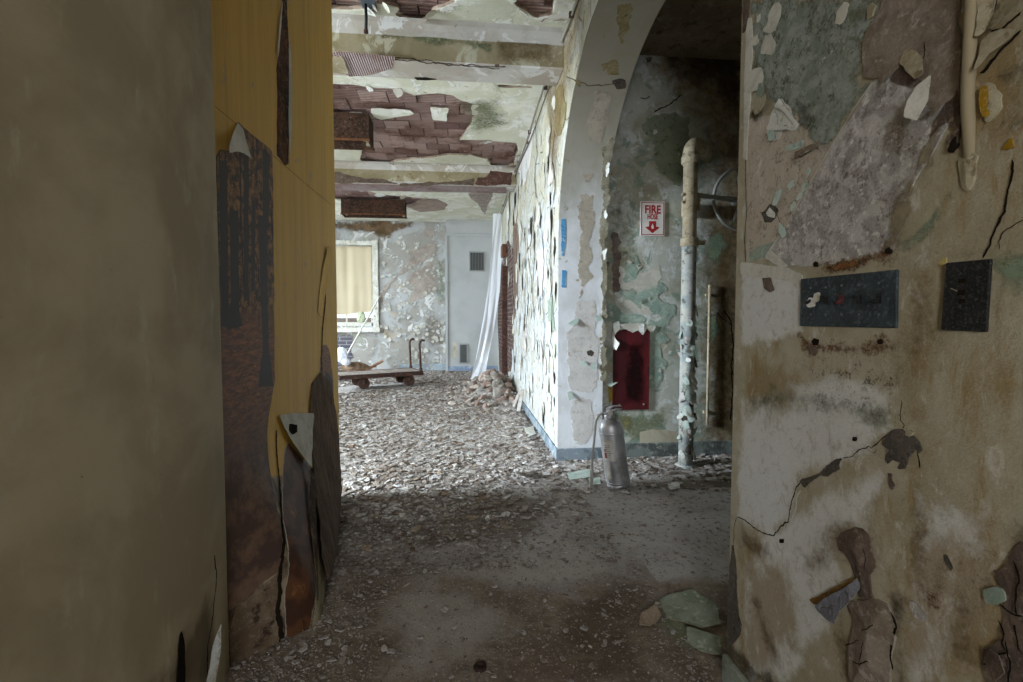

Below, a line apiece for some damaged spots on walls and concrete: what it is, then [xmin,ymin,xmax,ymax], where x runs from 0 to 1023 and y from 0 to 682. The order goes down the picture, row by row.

peeling [278,1,292,161]
flaking render [751,0,962,268]
peeling [335,83,699,459]
crack [983,160,1023,258]
crack [738,435,887,554]
flaking render [810,527,876,624]
flaking render [981,542,1023,682]